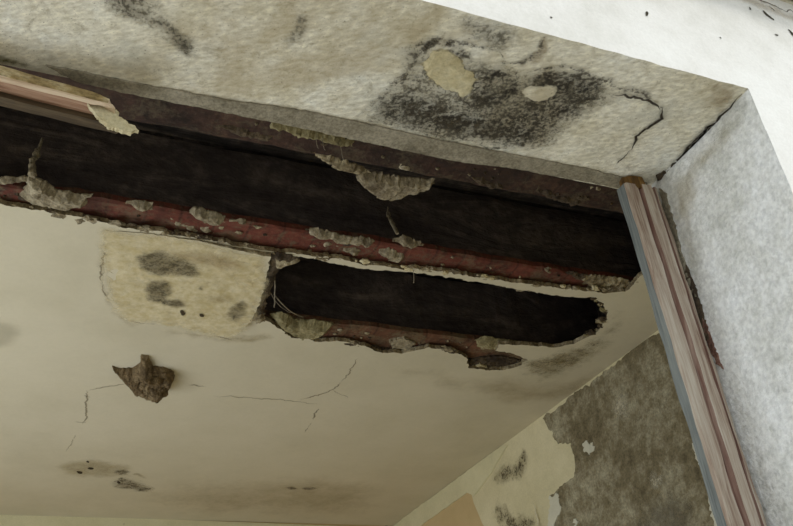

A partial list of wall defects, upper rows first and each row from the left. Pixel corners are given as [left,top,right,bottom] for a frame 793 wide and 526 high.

leakage [112,0,162,25]
leakage [372,25,612,149]
peeling [45,64,662,191]
crack [616,94,664,163]
peeling [0,175,100,224]
peeling [311,152,435,201]
peeling [305,227,461,275]
leakage [138,253,197,316]
peeling [560,270,631,336]
flaking render [543,333,717,526]
leakage [494,452,525,480]
leakage [496,508,533,526]